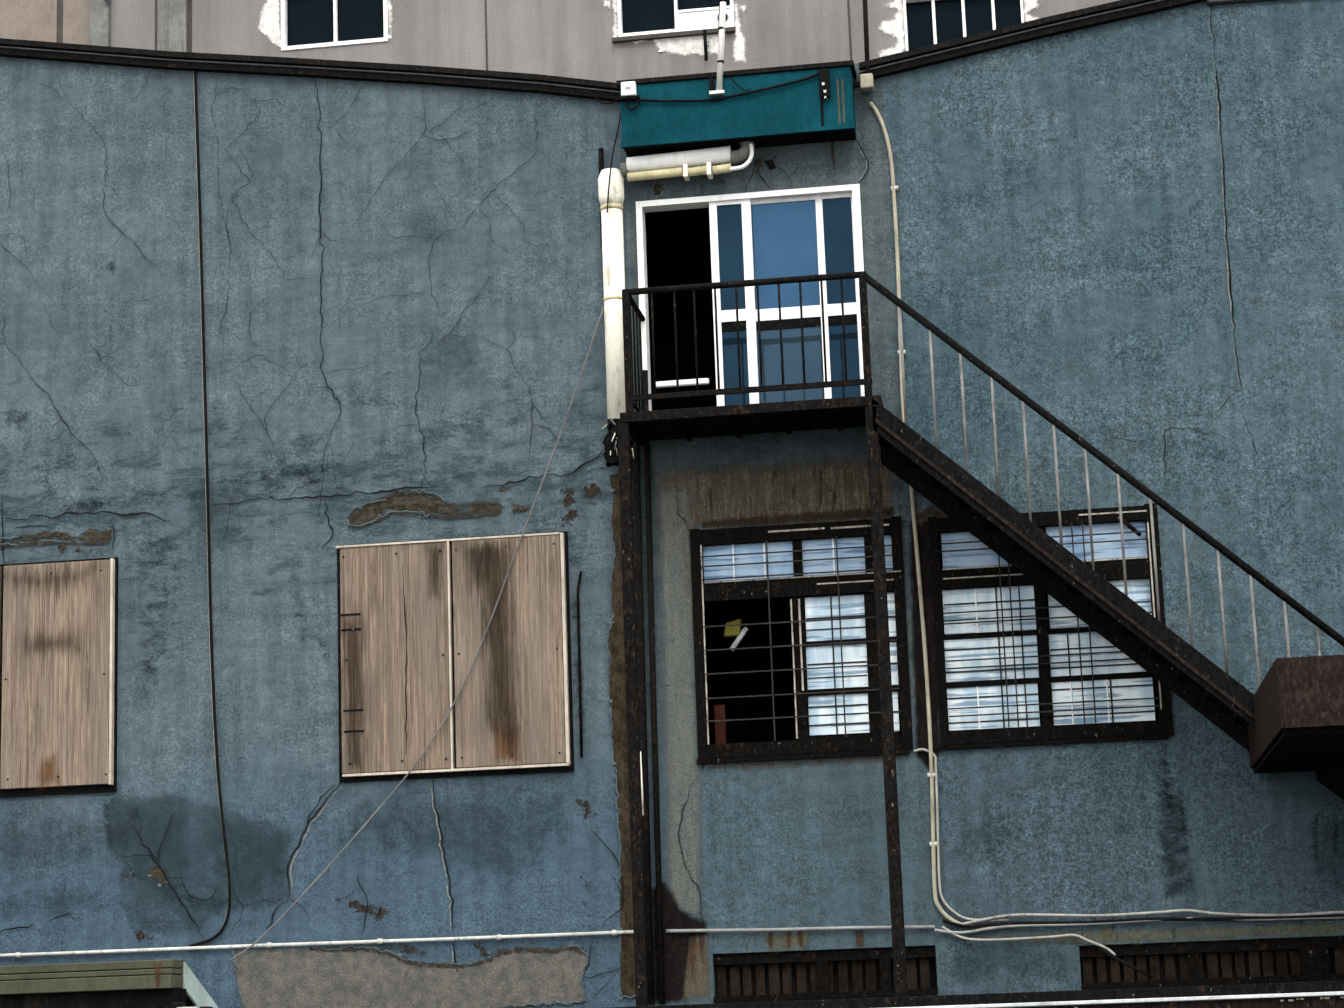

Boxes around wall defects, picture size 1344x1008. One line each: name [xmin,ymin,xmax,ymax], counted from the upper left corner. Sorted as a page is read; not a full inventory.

crack [0,74,174,386]
crack [194,73,605,549]
crack [1109,6,1259,487]
peeling [0,525,114,553]
crack [0,315,170,564]
peeling [347,487,530,529]
damp [652,458,893,1003]
crack [115,783,379,937]
peeling [232,941,589,1008]
crack [431,779,458,972]